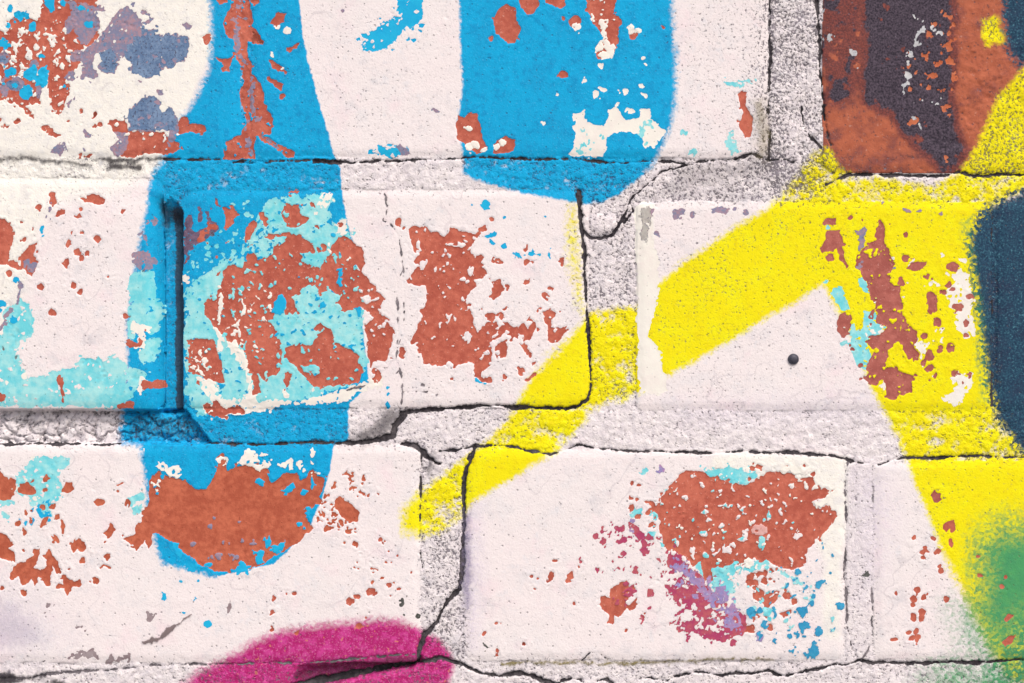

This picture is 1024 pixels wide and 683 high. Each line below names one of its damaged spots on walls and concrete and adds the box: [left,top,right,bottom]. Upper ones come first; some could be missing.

peeling [0,0,206,159]
peeling [456,112,515,154]
peeling [488,0,642,69]
peeling [569,77,666,159]
peeling [181,189,569,420]
crack [163,0,794,683]
peeling [820,215,976,400]
crack [16,662,254,679]
peeling [0,447,379,596]
peeling [593,462,845,659]
crack [639,548,1023,681]
crack [726,450,1024,523]